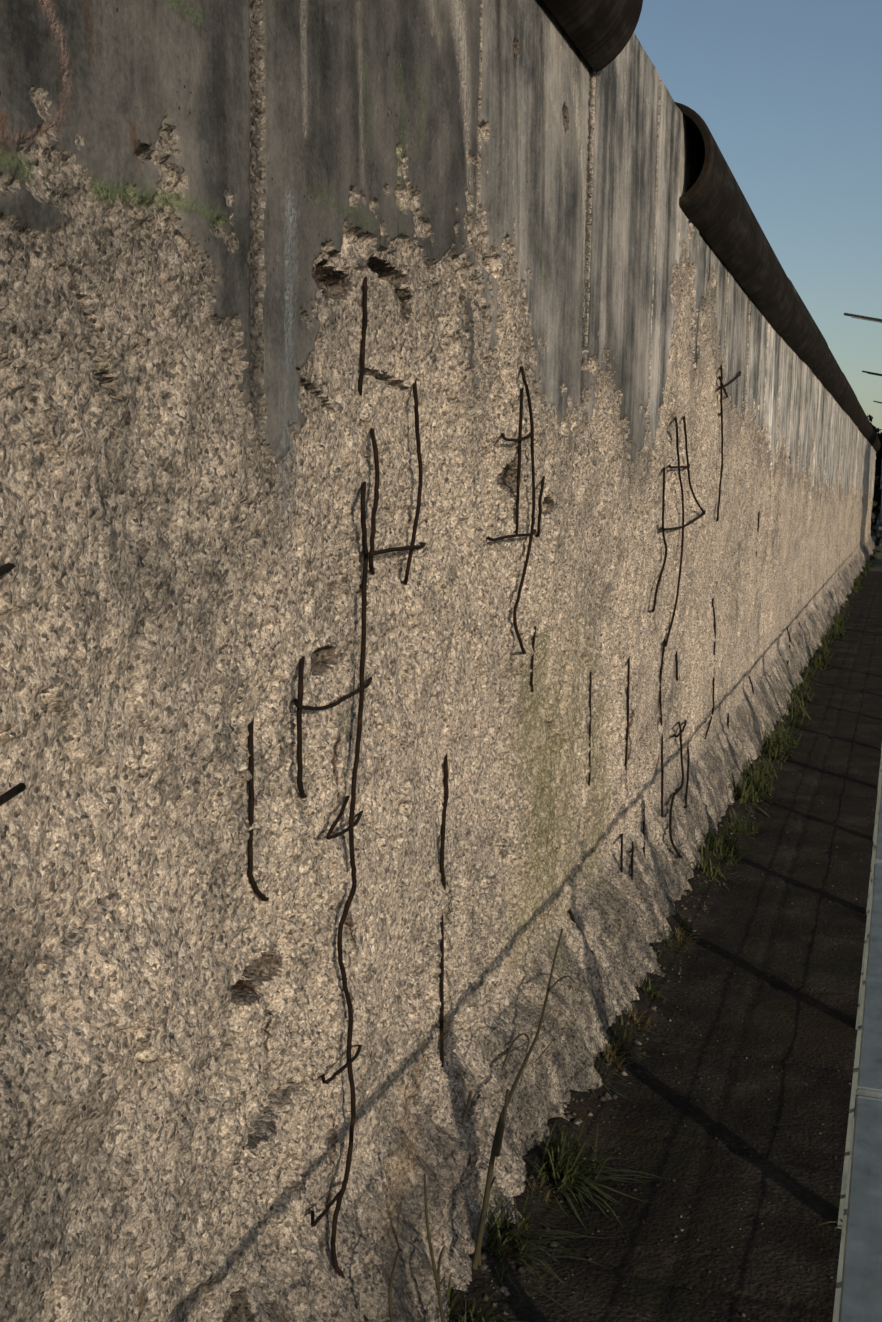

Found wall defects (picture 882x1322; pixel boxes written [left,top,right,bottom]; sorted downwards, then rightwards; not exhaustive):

spalling [0,85,477,1322]
water stain [453,0,467,113]
water stain [573,79,585,236]
spalling [427,188,875,1322]